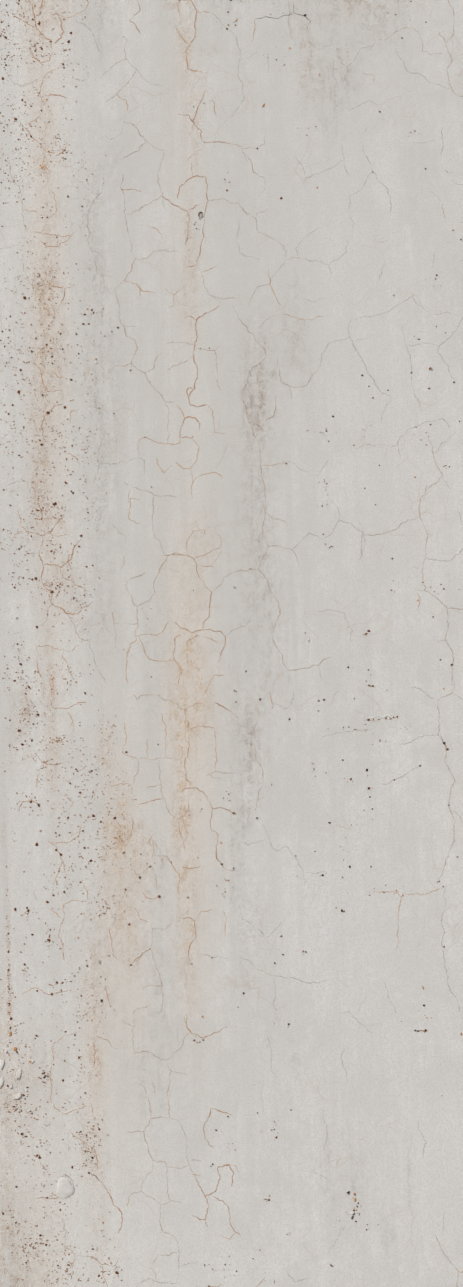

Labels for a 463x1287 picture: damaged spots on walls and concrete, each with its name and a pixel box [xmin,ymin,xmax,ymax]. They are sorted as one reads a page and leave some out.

crack [14,518,230,960]
crack [197,1164,237,1239]